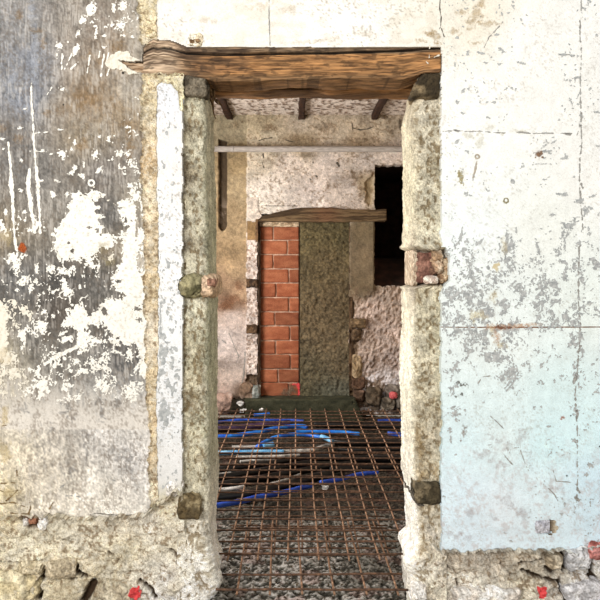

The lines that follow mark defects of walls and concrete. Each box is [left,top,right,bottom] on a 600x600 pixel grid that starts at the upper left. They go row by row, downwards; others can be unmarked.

peeling [520,132,569,175]
spalling [0,72,192,600]
peeling [445,406,466,443]
peeling [405,194,600,396]